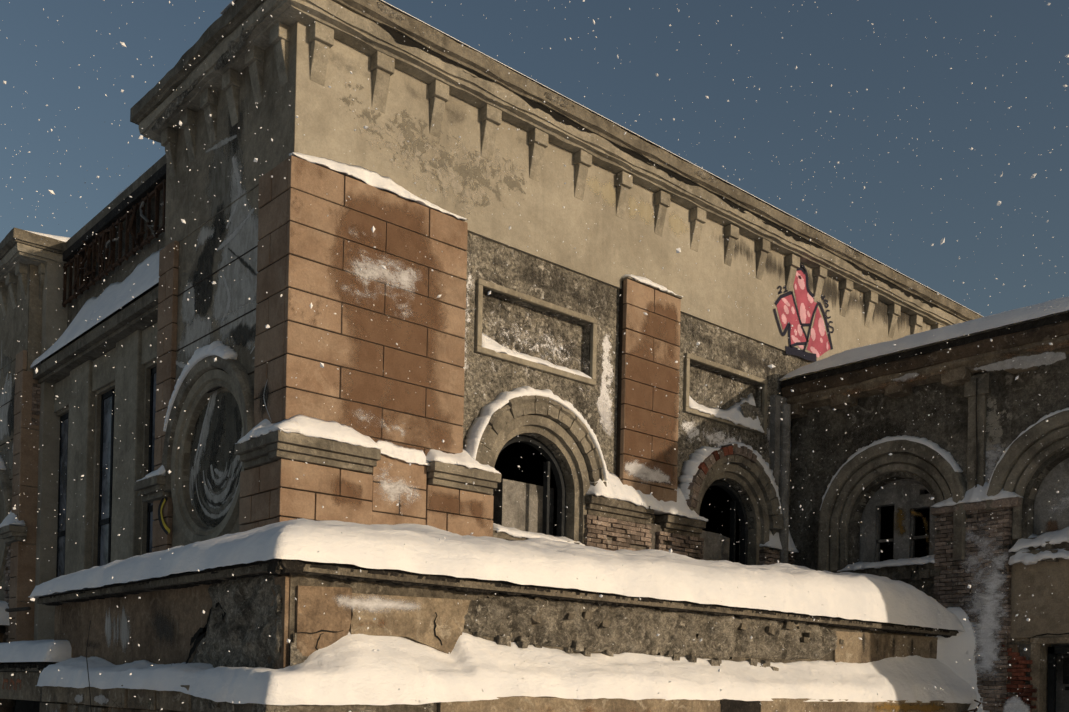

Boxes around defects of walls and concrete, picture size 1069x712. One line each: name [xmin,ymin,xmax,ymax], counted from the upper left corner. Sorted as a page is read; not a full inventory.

peeling [341,84,526,215]
water stain [333,197,450,453]
flaking render [584,514,704,560]
flaking render [759,549,795,565]
spalling [192,575,309,669]
spalling [464,589,844,671]
flaking render [997,644,1037,712]